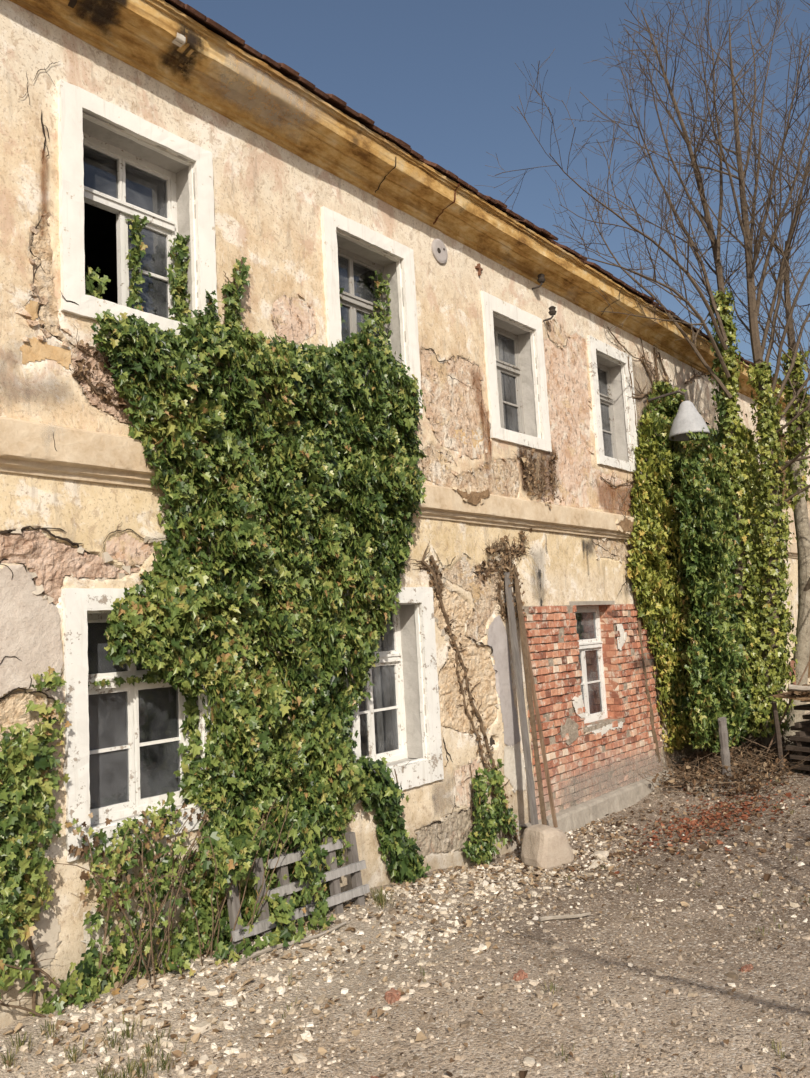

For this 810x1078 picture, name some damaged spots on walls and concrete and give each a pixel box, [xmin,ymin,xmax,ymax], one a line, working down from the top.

water stain [77,0,126,34]
water stain [162,25,203,80]
flaking render [14,212,143,424]
peeling [421,350,520,504]
flaking render [0,526,162,605]
crack [0,656,65,704]
flaking render [433,556,526,793]
flaking render [416,756,484,857]